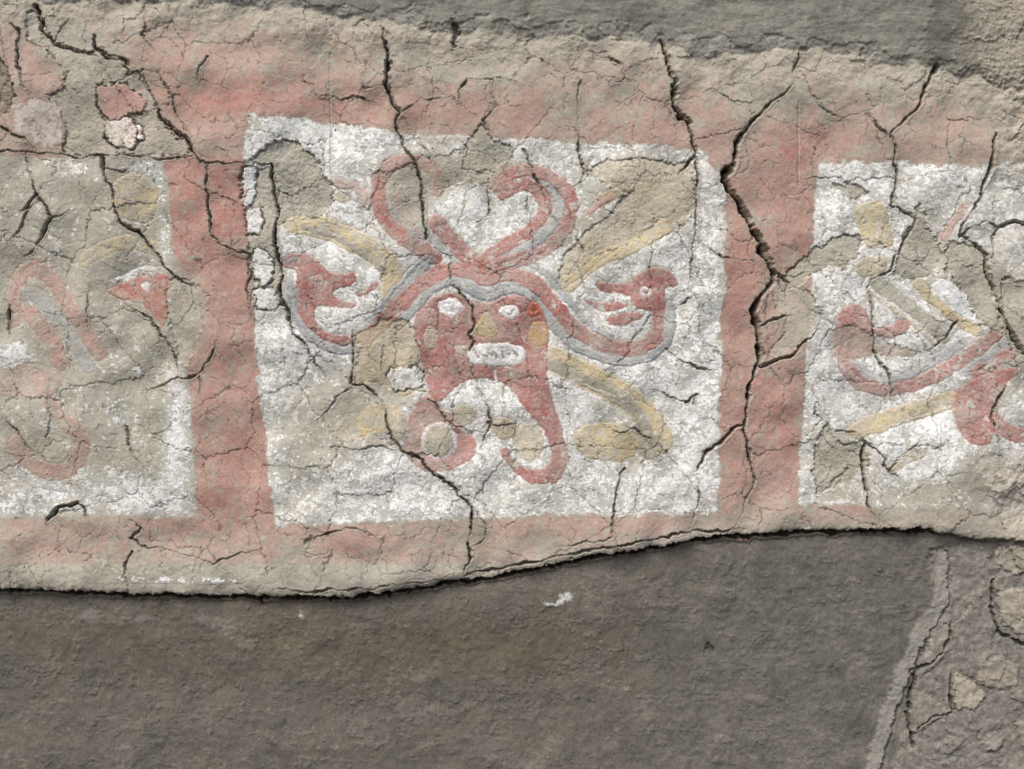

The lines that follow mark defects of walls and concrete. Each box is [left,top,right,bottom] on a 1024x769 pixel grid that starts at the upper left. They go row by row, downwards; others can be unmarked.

crack [957,131,1024,356]
crack [0,2,942,605]
crack [928,319,960,352]
crack [989,385,1009,472]
peeling [118,576,242,584]
peeling [300,534,317,552]
flaking render [865,538,1024,769]